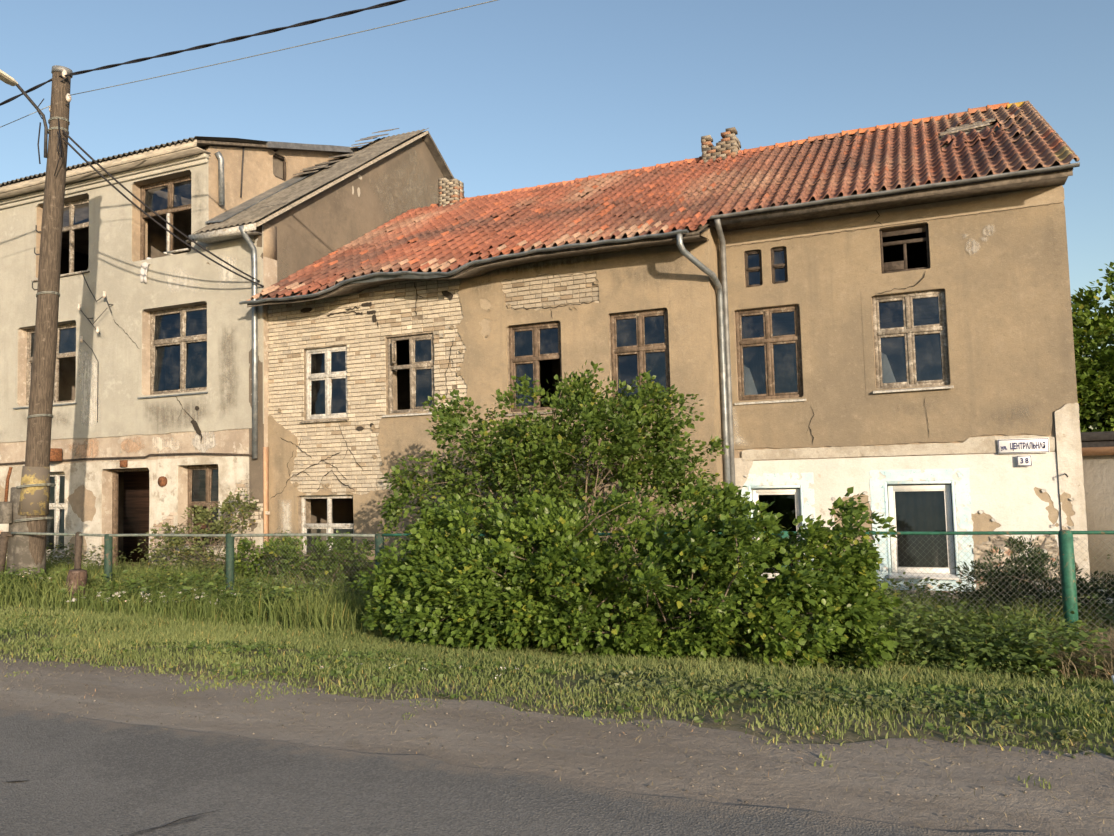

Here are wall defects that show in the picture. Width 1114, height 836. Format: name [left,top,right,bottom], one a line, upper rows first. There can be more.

flaking render [501,272,600,310]
flaking render [67,485,96,563]
flaking render [832,491,873,544]
flaking render [876,487,1079,607]